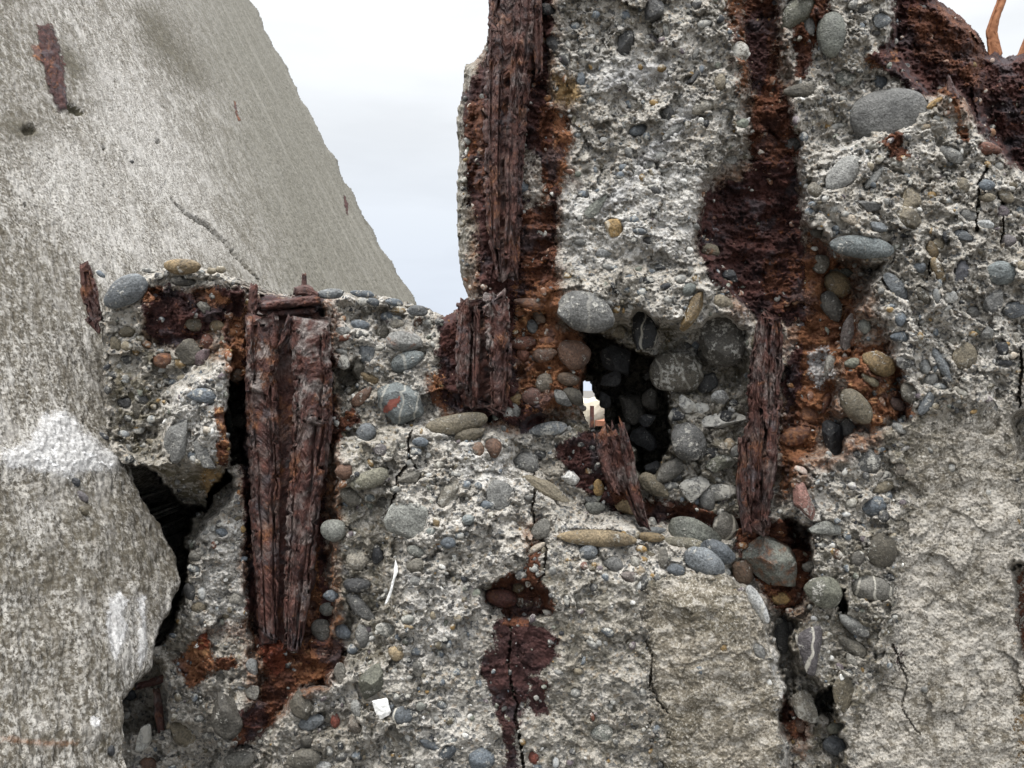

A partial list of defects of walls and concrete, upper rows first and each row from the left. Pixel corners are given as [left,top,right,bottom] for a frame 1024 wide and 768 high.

rust [864,0,1024,172]
rust [425,0,591,434]
spalling [150,381,245,642]
rust [140,282,363,748]
spalling [331,366,361,396]
crack [390,430,418,505]
crack [531,472,548,581]
spalling [583,333,673,475]
rust [696,0,915,615]
crack [506,626,525,768]
rust [478,542,562,768]
crack [645,641,665,710]